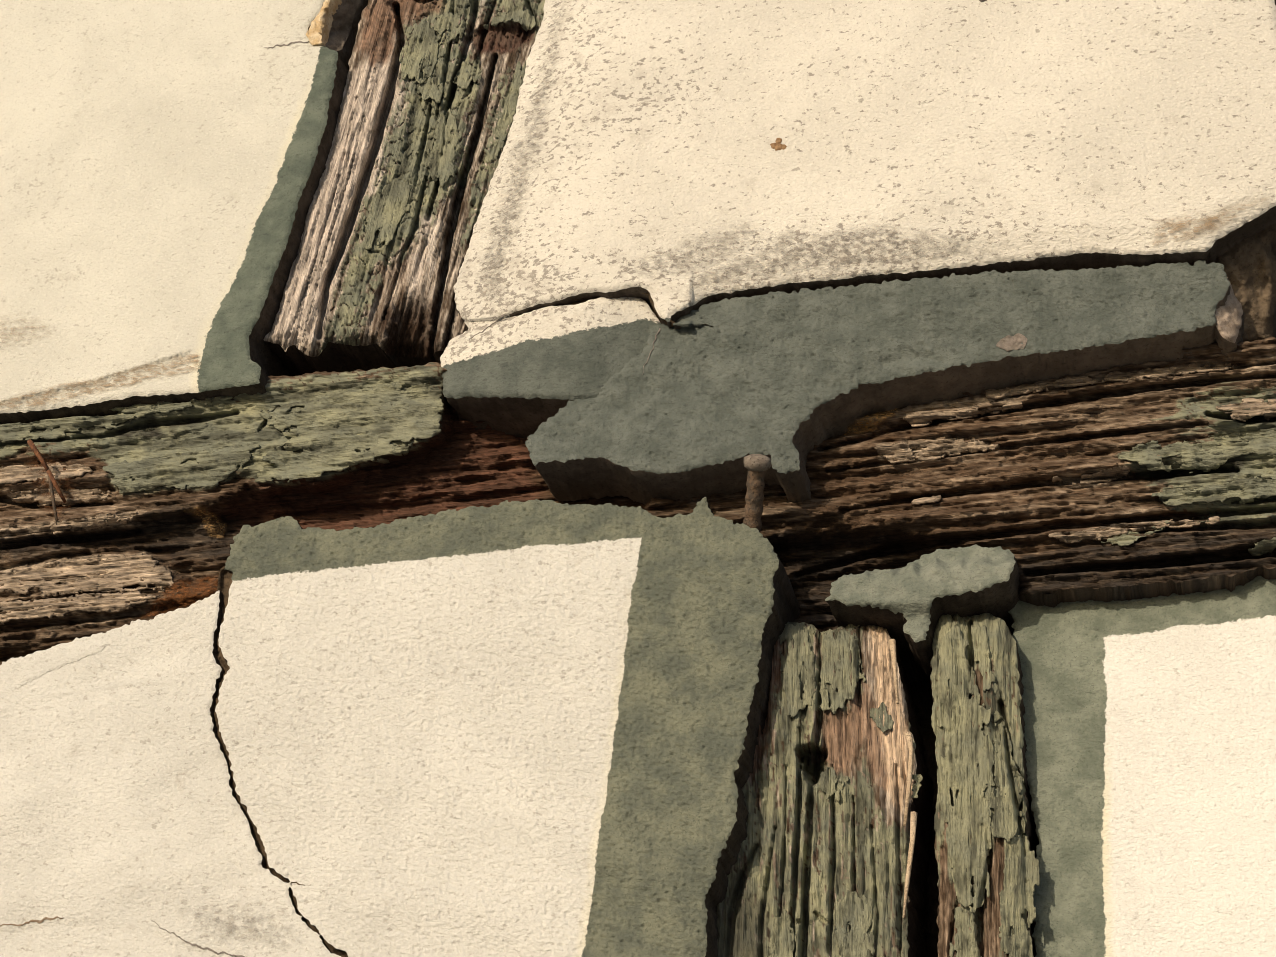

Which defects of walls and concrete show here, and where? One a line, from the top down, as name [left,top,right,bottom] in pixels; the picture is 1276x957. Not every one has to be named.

spalling [306,0,368,71]
crack [472,297,597,338]
crack [642,291,678,375]
peeling [0,396,233,443]
peeling [102,382,444,494]
peeling [1101,430,1276,546]
peeling [16,639,109,688]
peeling [778,624,866,718]
crack [213,566,348,957]
peeling [937,621,1040,957]
crack [0,916,64,926]
crack [151,920,245,957]